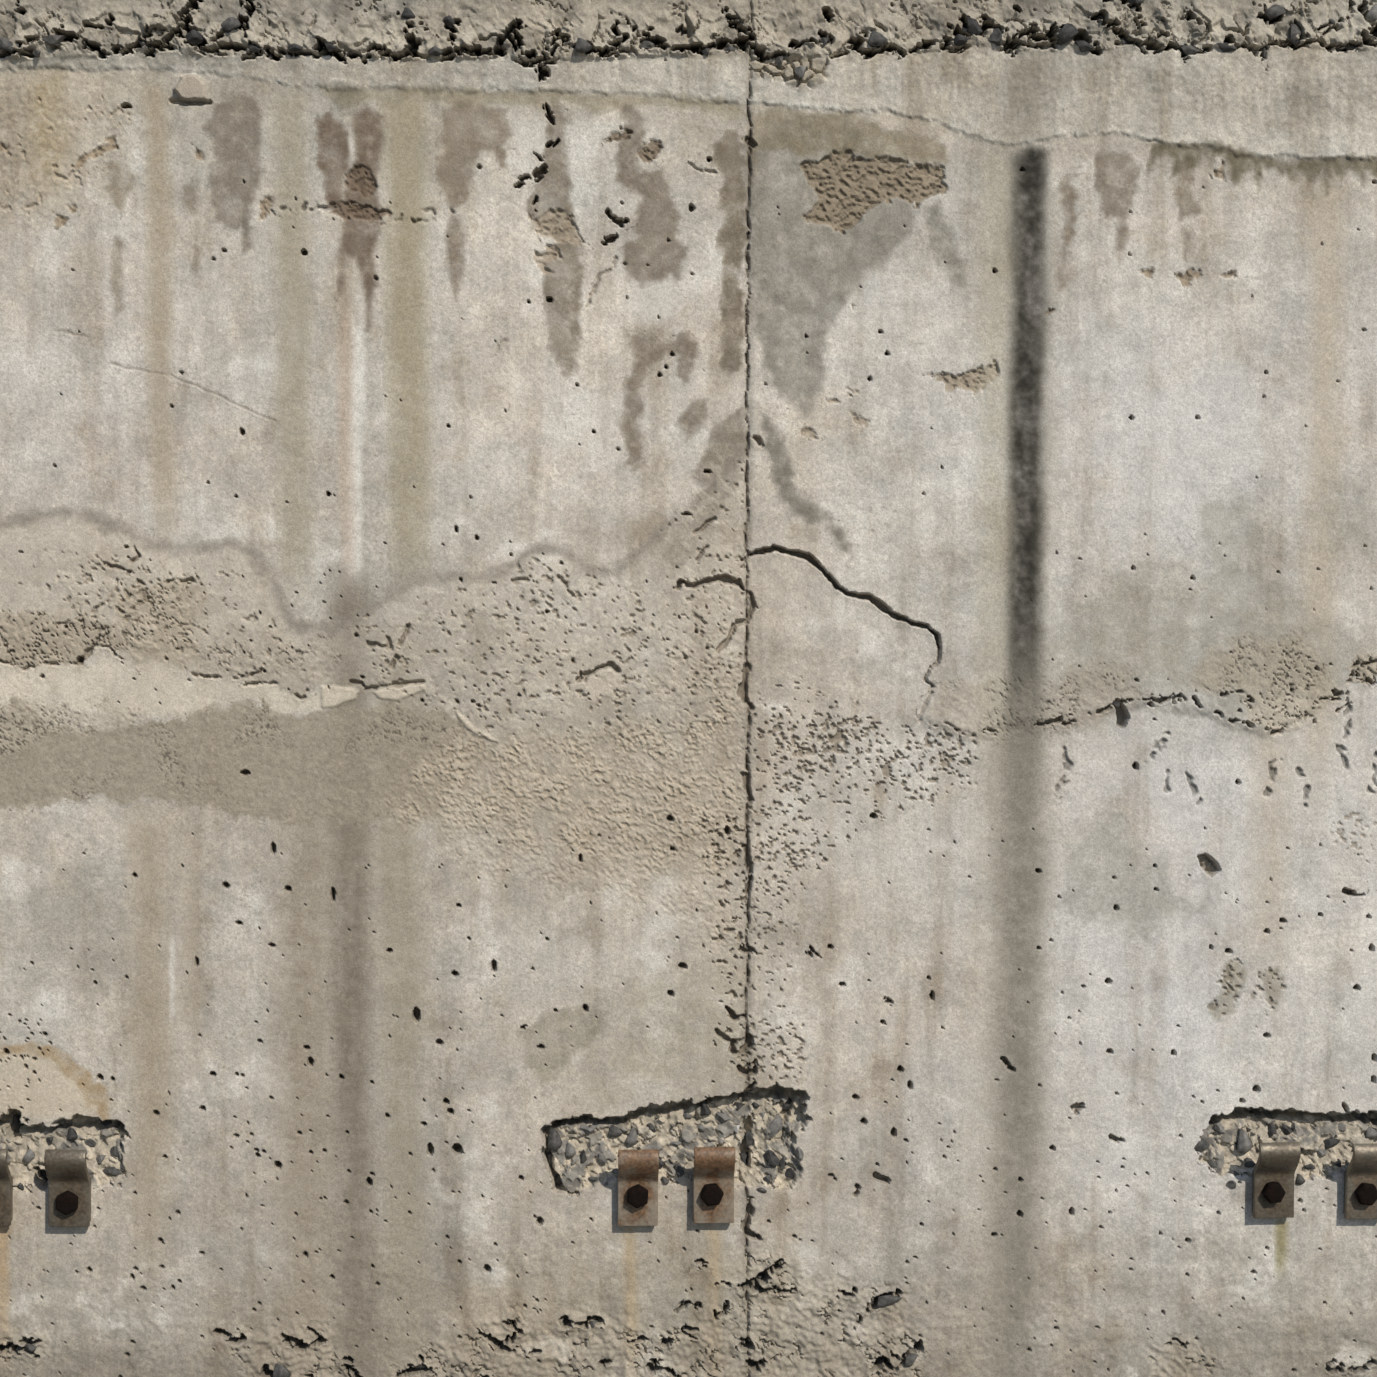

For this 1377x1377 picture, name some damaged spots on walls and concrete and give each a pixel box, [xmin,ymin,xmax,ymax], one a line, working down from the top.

spalling [509,103,634,275]
spalling [0,0,1377,242]
leakage [0,65,856,712]
crack [0,0,1377,1092]
peeling [0,584,1016,1197]
leakage [709,52,1377,1377]
peeling [1202,638,1377,899]
leakage [258,810,439,1377]
spalling [1194,1107,1377,1188]
spalling [204,1319,365,1377]
spalling [390,1247,933,1377]
crack [739,1184,764,1377]